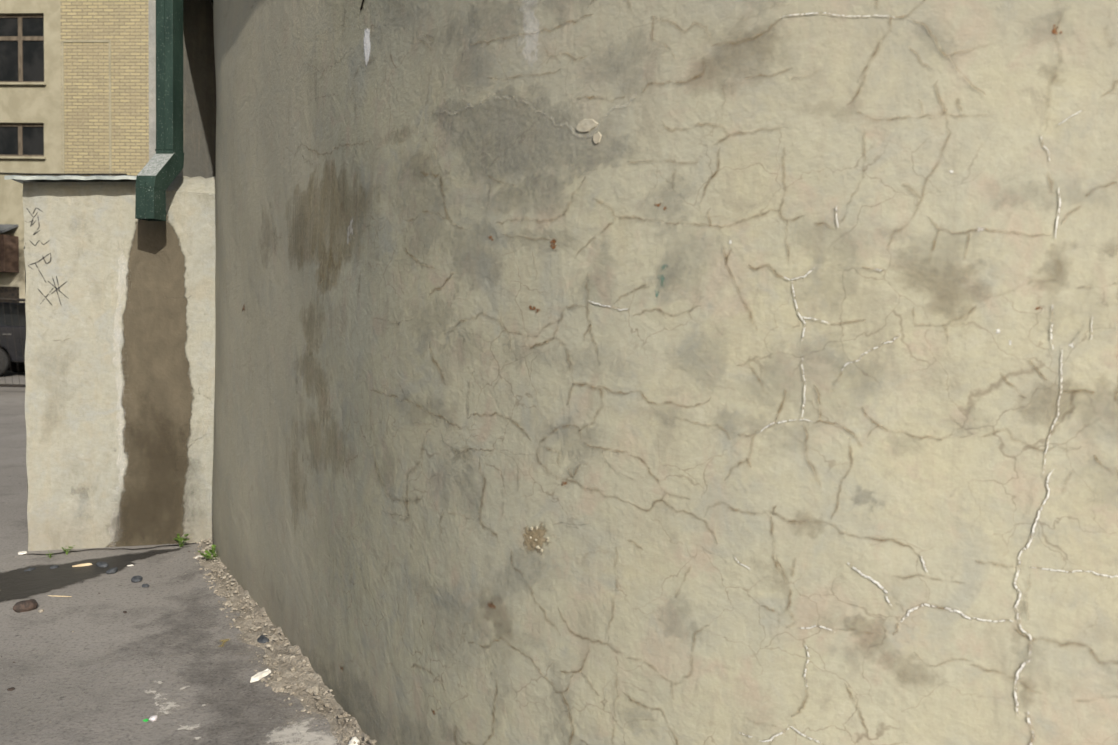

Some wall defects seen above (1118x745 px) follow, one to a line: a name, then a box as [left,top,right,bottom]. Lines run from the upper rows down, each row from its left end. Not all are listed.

crack [1054,188,1062,238]
leakage [0,214,194,602]
crack [725,250,874,461]
spalling [523,522,549,555]
crack [848,305,1118,745]
crack [742,593,832,742]